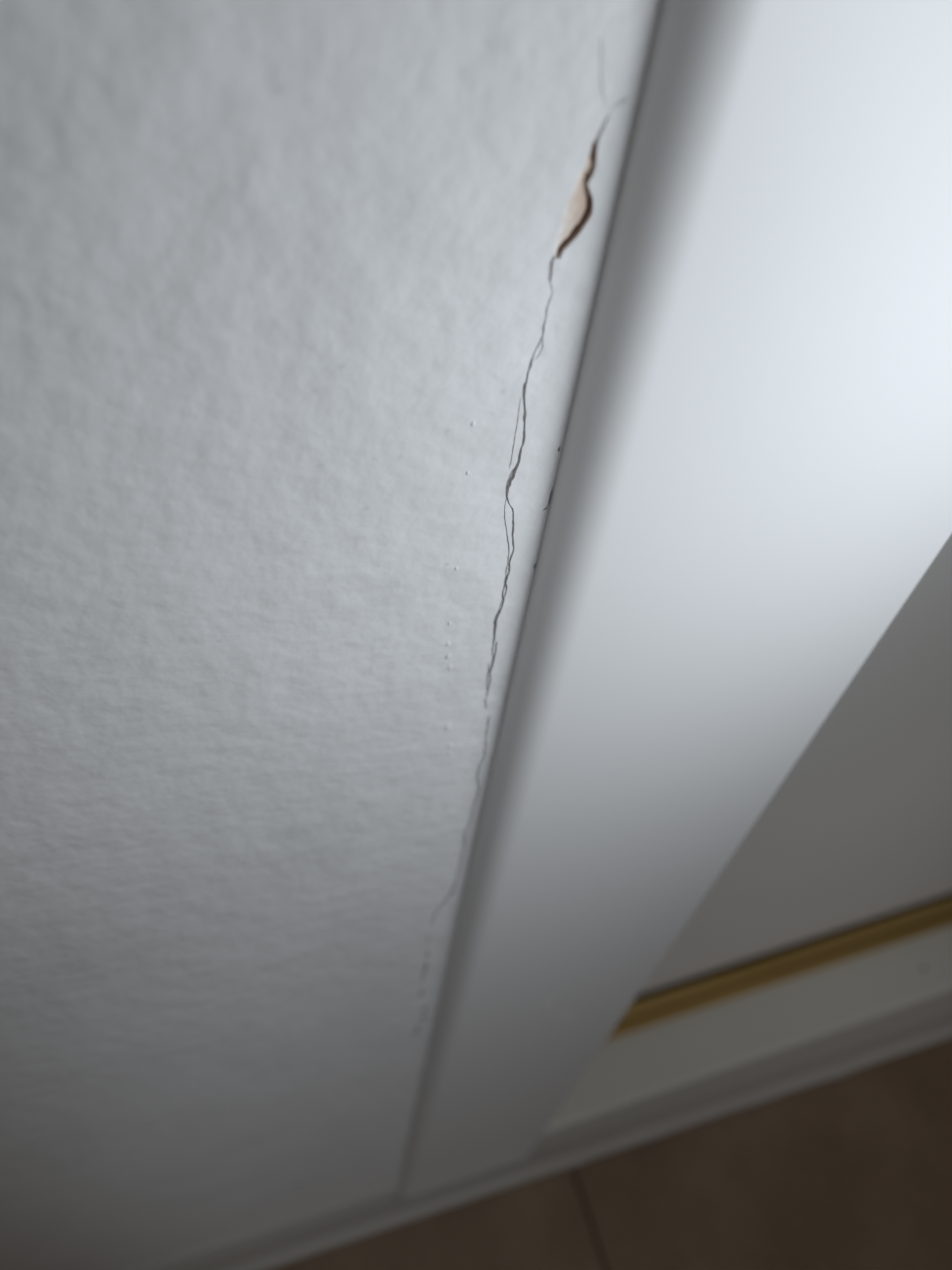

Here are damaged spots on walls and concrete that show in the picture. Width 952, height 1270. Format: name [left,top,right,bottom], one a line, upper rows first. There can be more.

flaking render [549,135,598,281]
crack [420,283,552,996]